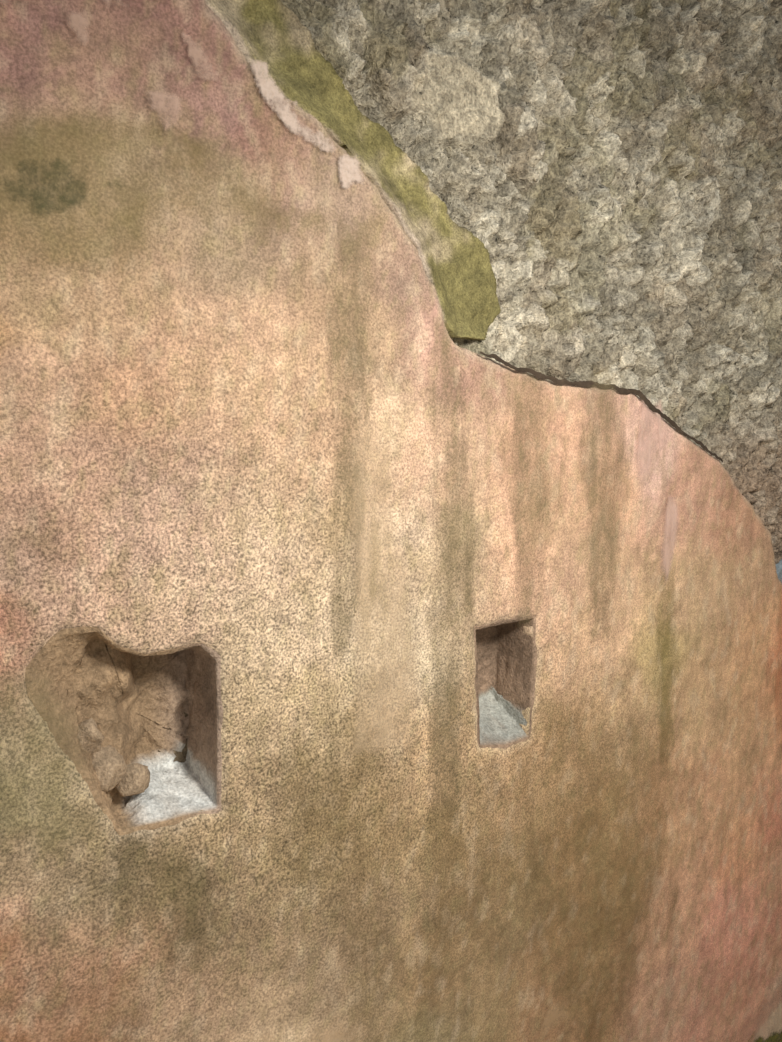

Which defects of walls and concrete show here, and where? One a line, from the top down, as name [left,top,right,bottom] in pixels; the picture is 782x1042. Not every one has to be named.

peeling [69,13,87,43]
peeling [149,92,180,127]
peeling [183,34,215,80]
peeling [251,60,362,188]
flaking render [281,0,782,584]
spalling [25,626,223,836]